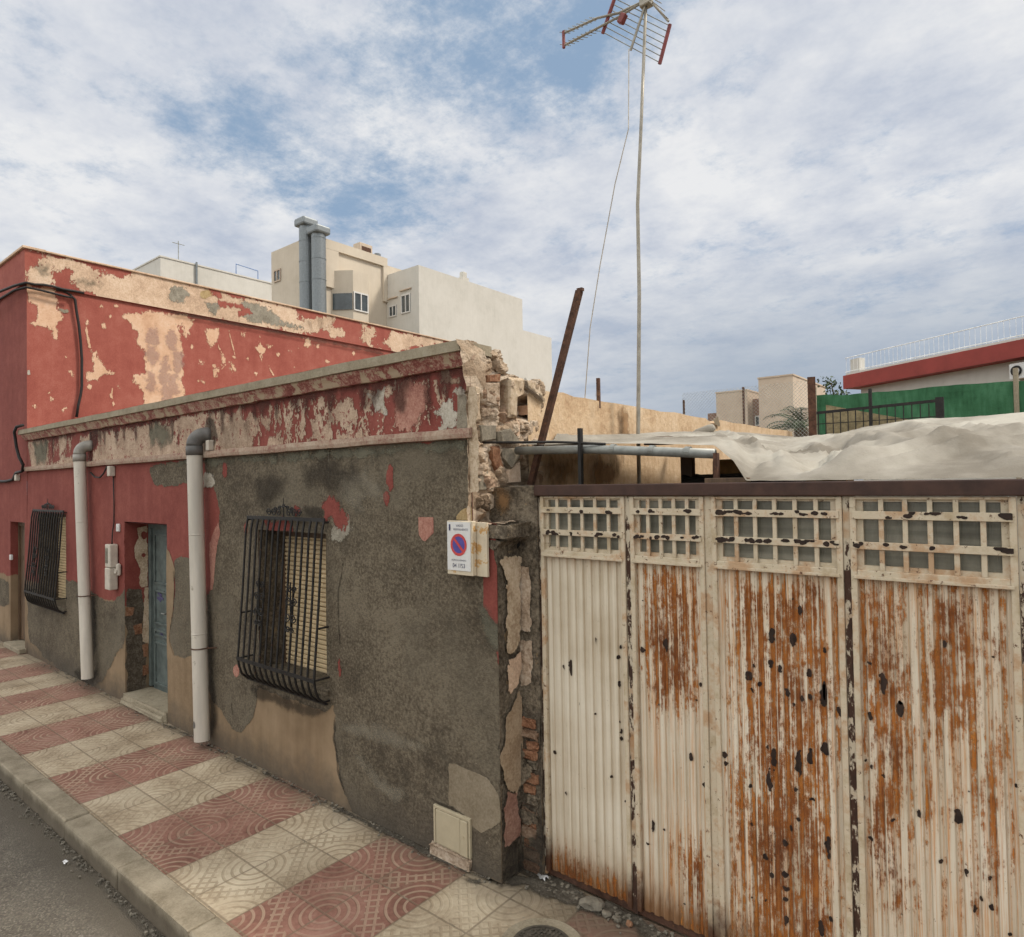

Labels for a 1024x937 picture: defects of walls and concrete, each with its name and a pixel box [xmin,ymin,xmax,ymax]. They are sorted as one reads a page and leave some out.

peeling [25,250,345,404]
peeling [359,322,443,352]
spalling [26,339,546,855]
corrosion [637,564,702,726]
corrosion [722,570,853,937]
corrosion [860,579,1017,936]
spalling [471,821,502,881]
corrosion [552,839,626,901]
corrosion [646,820,708,937]